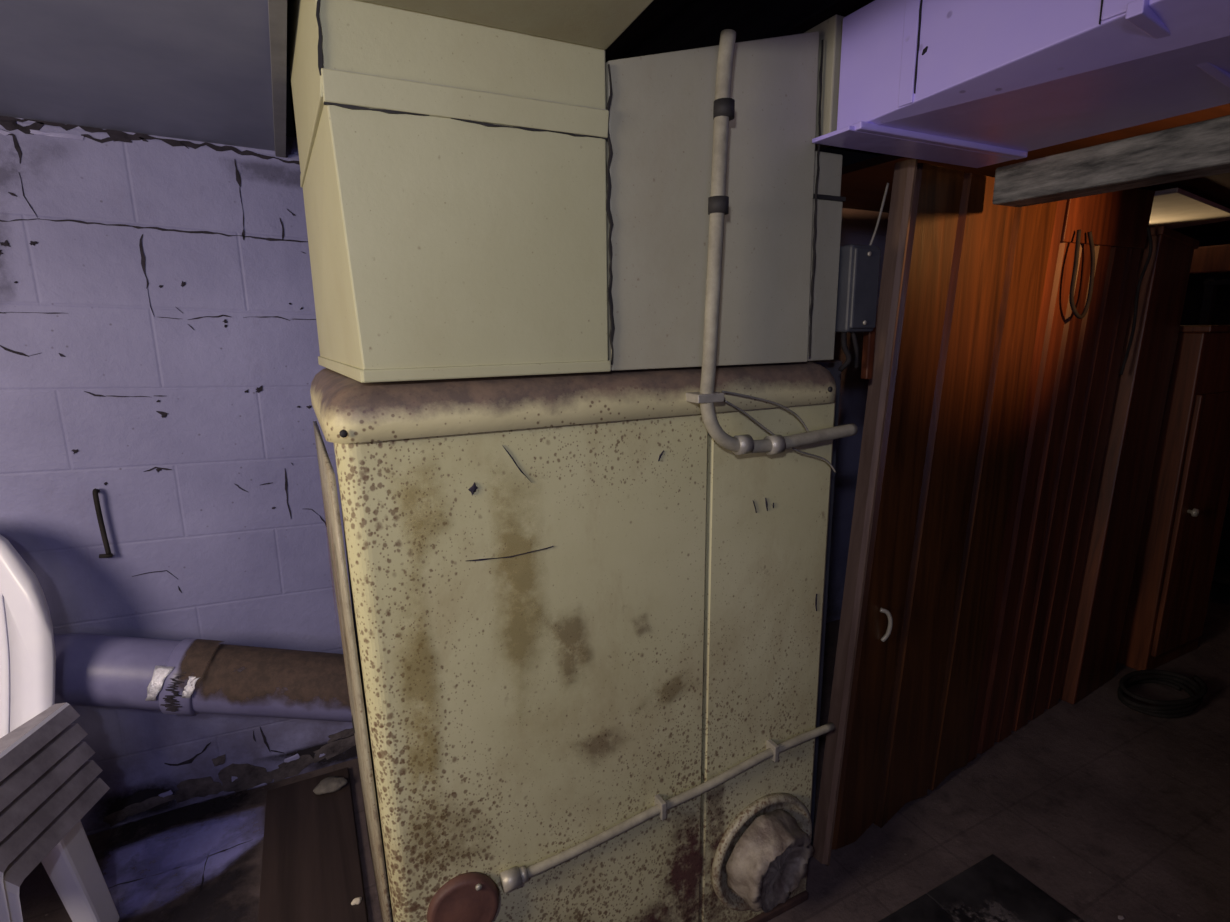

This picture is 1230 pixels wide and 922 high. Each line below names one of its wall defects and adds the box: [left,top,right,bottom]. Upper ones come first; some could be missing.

crack [0,116,316,330]
crack [0,345,65,357]
spalling [103,728,356,827]